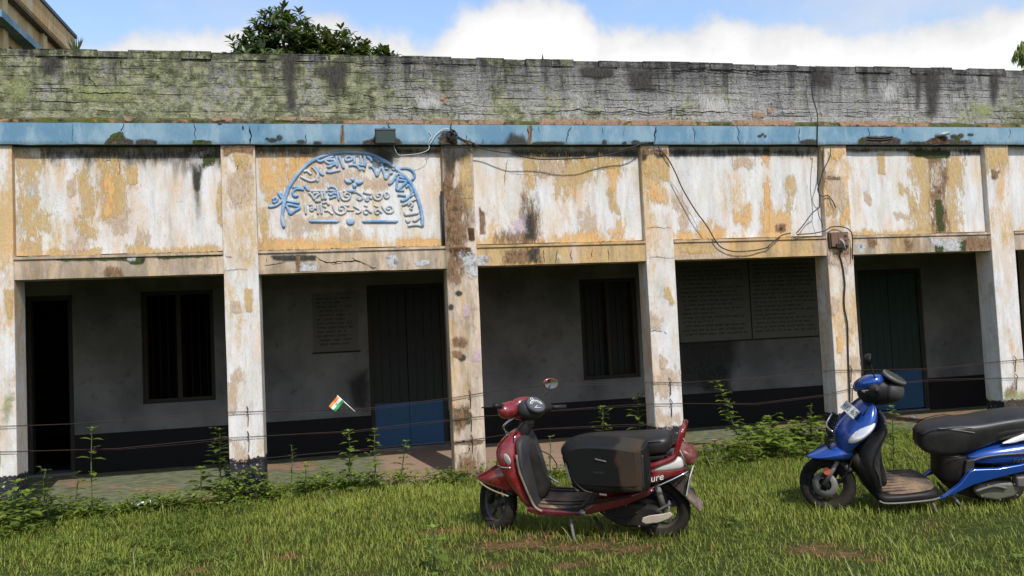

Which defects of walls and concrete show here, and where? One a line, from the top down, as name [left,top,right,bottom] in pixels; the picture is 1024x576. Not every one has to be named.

leakage [320,63,347,95]
leakage [916,71,938,115]
leakage [991,73,1000,103]
peeling [16,116,222,261]
leakage [44,147,221,201]
peeling [216,146,391,251]
peeling [530,151,634,243]
peeling [641,149,797,240]
peeling [827,183,932,236]
spalling [840,121,972,175]
leakage [846,133,991,252]
crack [316,256,396,268]